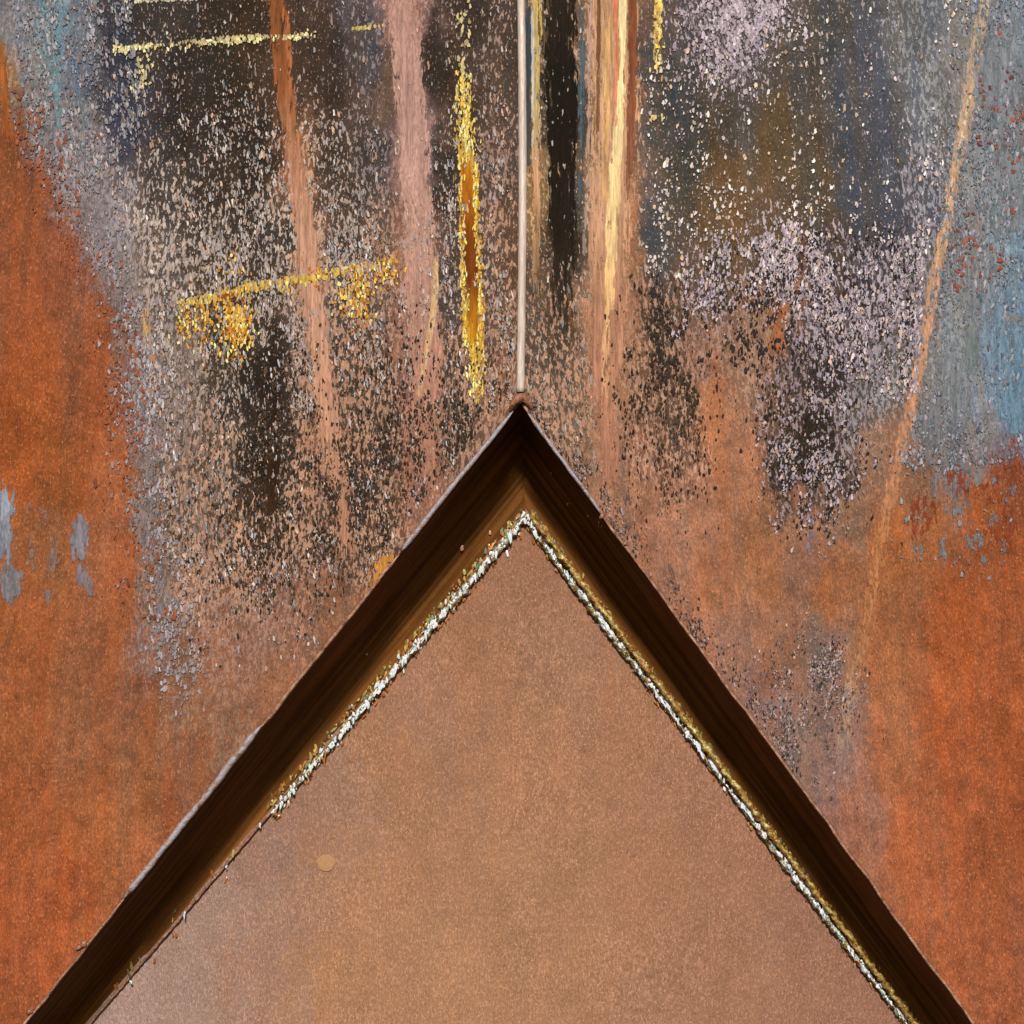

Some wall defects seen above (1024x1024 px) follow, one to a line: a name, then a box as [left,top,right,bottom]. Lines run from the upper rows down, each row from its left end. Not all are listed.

rust [0,39,123,273]
rust [79,279,176,620]
peeling [0,0,1024,717]
rust [902,459,1024,553]
peeling [667,579,877,823]